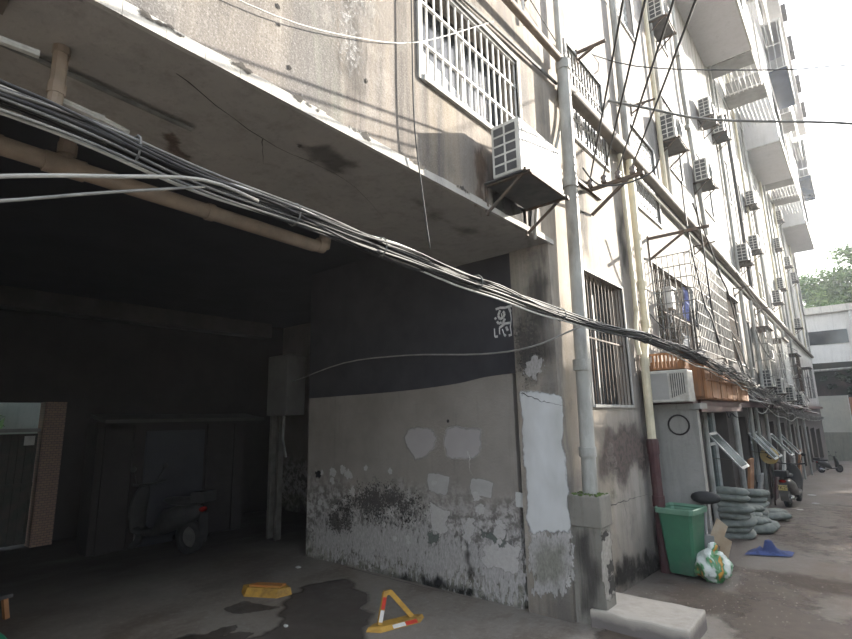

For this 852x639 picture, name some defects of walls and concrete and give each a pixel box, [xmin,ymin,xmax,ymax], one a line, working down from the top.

damp [599,424,649,485]
damp [326,479,432,537]
peeling [307,465,575,609]
damp [481,530,506,548]
damp [422,576,447,589]